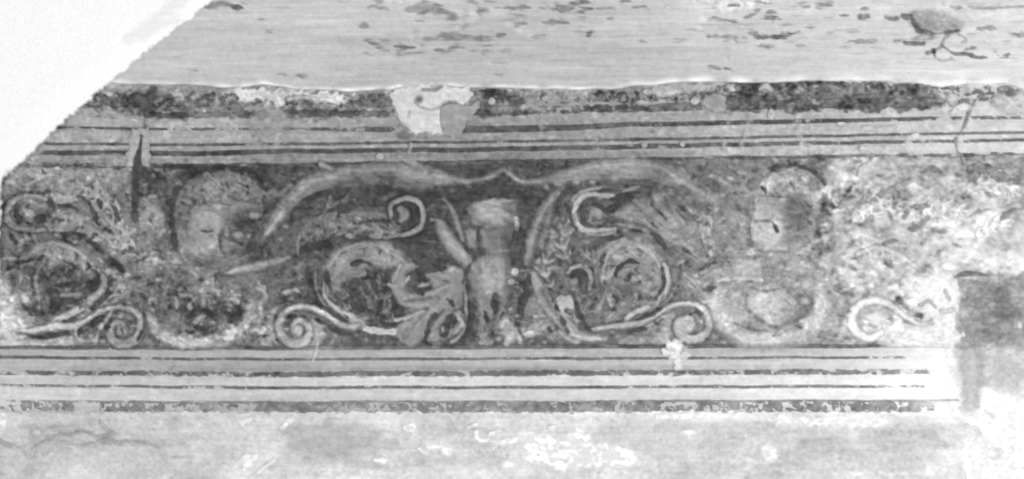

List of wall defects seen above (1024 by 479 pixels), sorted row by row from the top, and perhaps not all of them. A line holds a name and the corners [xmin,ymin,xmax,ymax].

crack [131,86,157,223]
crack [955,89,985,164]